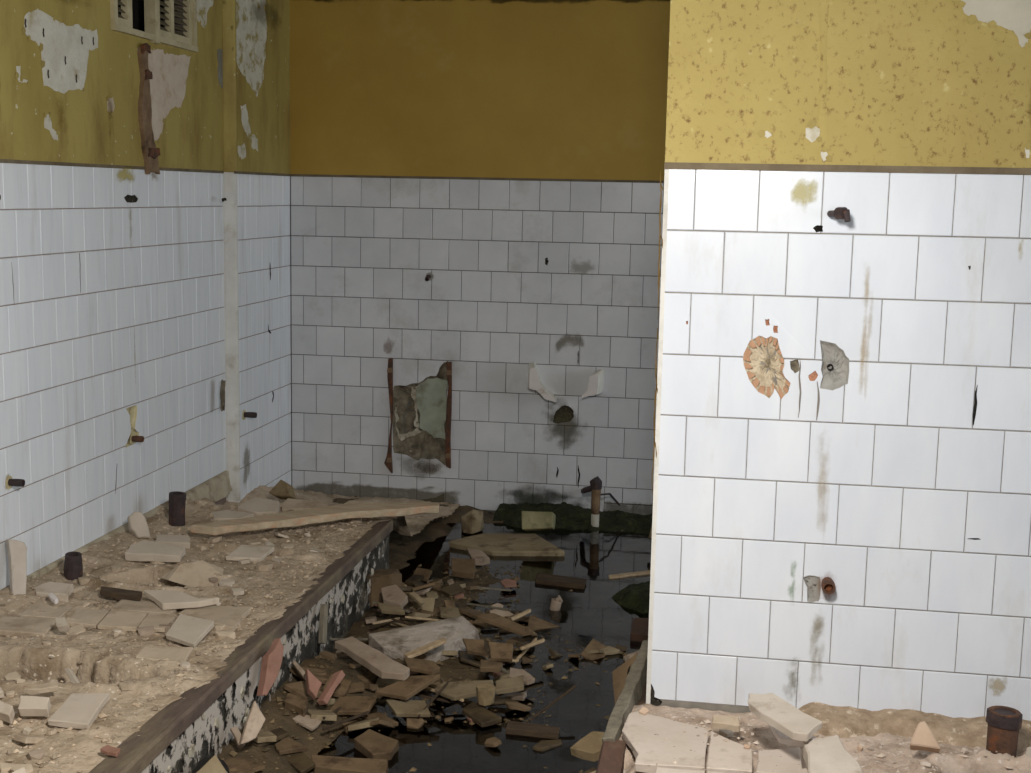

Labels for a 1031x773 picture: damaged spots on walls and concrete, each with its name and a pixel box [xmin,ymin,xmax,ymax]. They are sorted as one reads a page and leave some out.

peeling [22,10,98,94]
peeling [197,0,268,96]
peeling [958,0,1031,48]
peeling [148,48,191,144]
peeling [237,104,259,161]
spalling [743,319,849,400]
spalling [392,362,448,465]